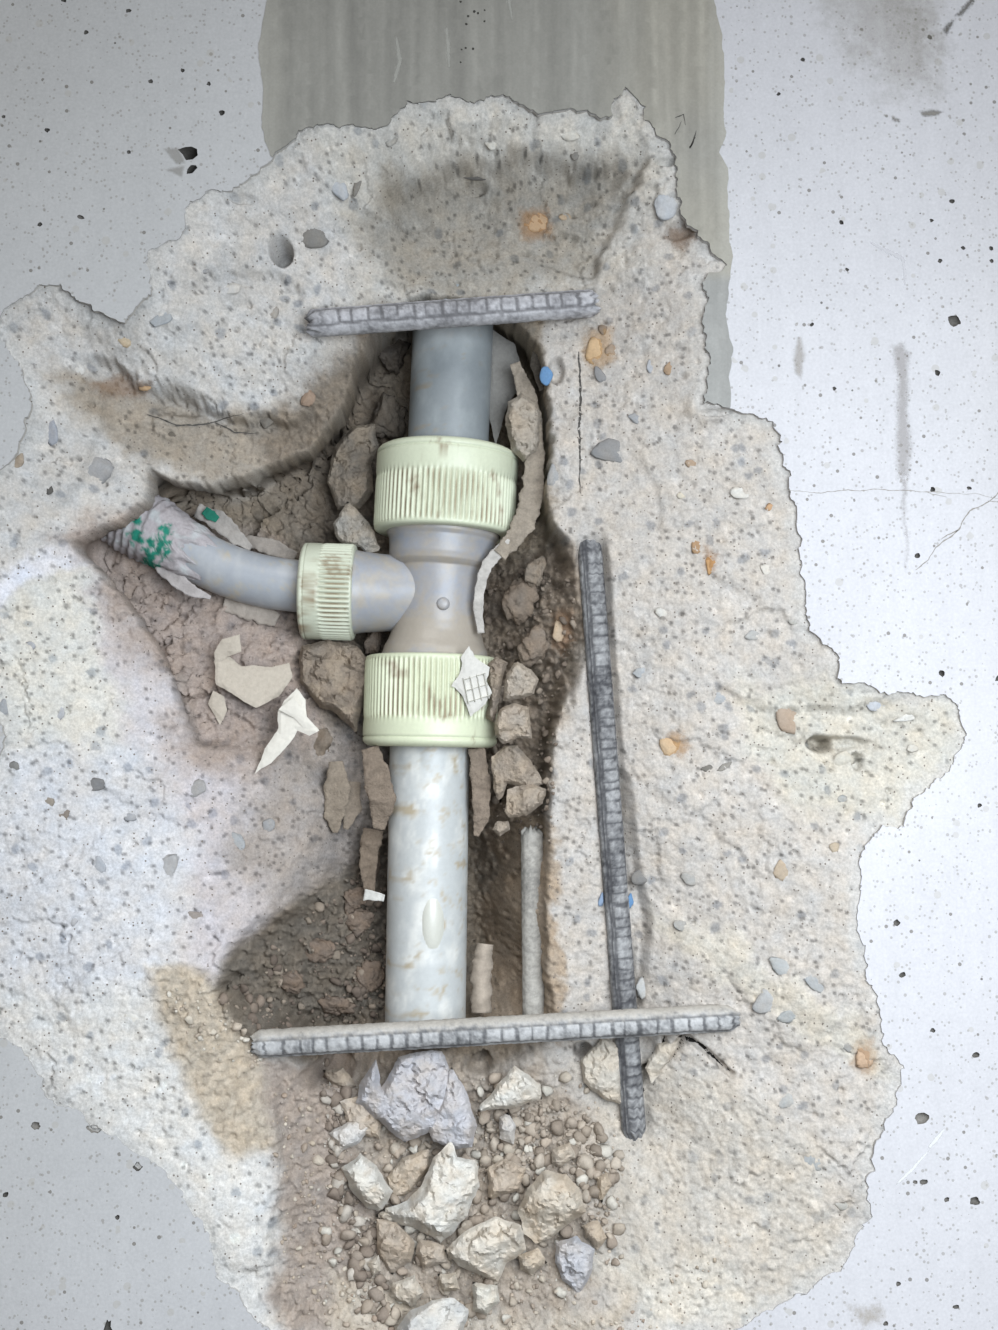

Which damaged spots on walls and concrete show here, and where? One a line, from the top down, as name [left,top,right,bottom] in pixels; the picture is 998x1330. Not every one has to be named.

spalling [178,147,198,174]
spalling [304,290,602,338]
spalling [948,315,961,327]
spalling [489,393,525,509]
spalling [357,437,398,554]
crack [788,489,998,570]
spalling [331,631,391,657]
spalling [776,708,796,734]
spalling [578,539,637,1010]
spalling [250,646,741,1076]
spalling [752,988,773,1014]
spalling [614,1037,646,1141]